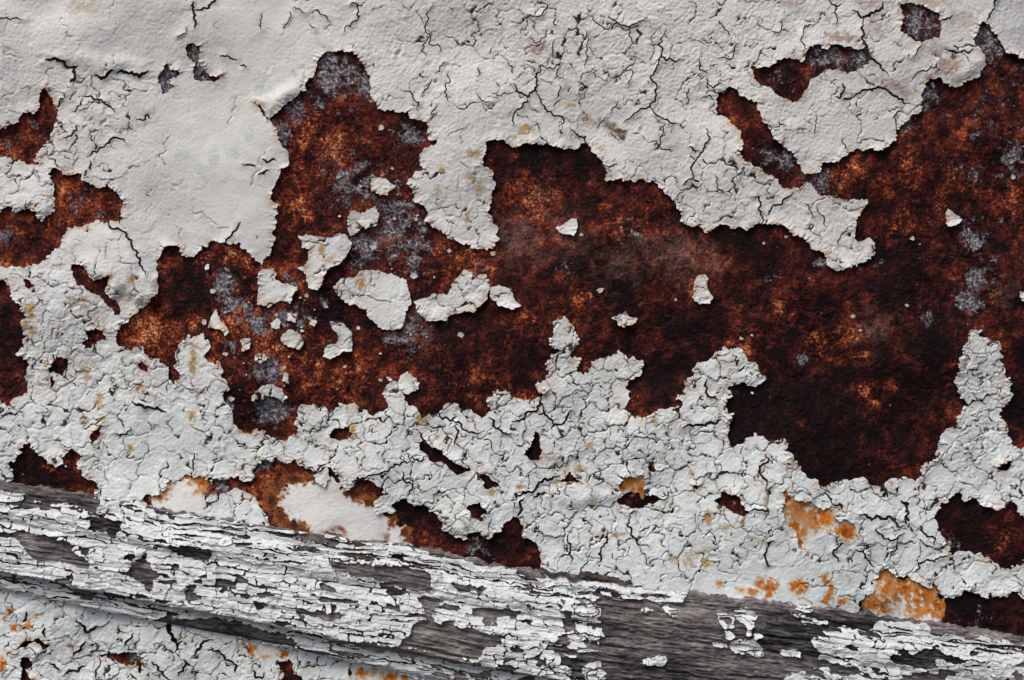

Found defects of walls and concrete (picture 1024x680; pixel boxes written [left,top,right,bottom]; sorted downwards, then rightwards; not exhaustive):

crack [178,0,216,37]
crack [2,57,170,210]
crack [259,0,974,269]
peeling [0,168,124,409]
peeling [71,22,1024,490]
rust [263,474,344,534]
spalling [143,457,542,570]
rust [342,488,377,507]
crack [0,219,1024,680]
rust [782,490,858,551]
peeling [520,568,1024,680]
rust [863,569,946,619]